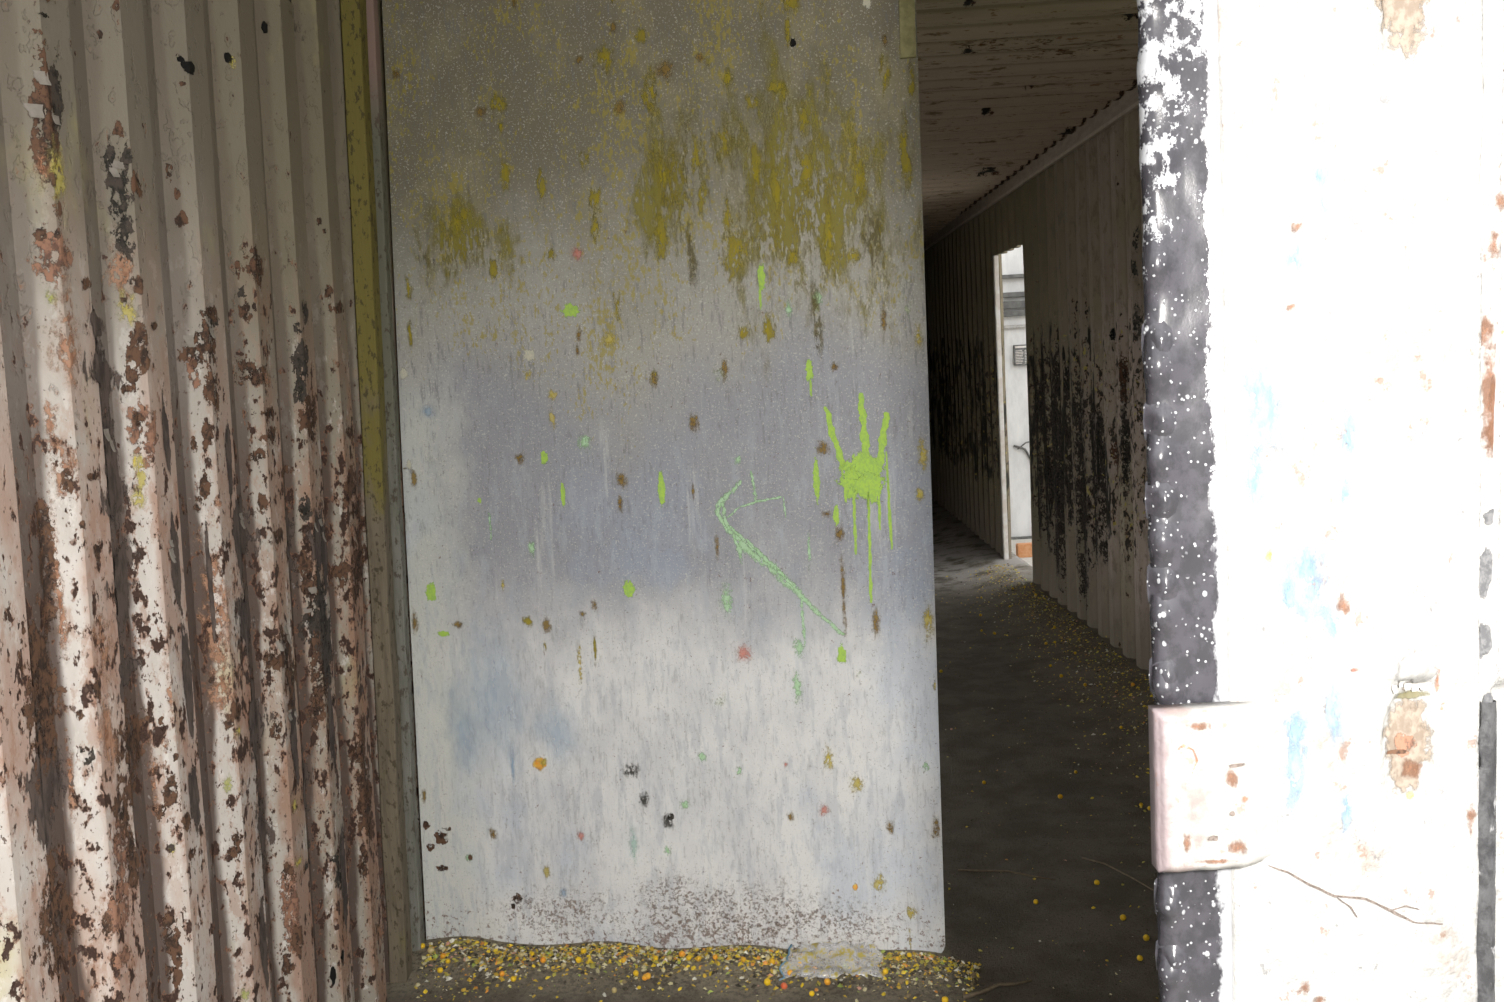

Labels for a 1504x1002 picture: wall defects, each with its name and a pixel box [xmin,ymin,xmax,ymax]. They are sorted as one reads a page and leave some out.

spalling [1376,0,1430,58]
corrosion [23,0,92,385]
leakage [688,234,697,277]
leakage [722,198,749,282]
leakage [768,81,812,197]
leakage [820,138,881,272]
corrosion [110,253,158,469]
corrosion [177,305,271,453]
leakage [812,283,822,348]
corrosion [17,402,140,990]
spalling [1383,680,1434,792]
corrosion [160,913,183,989]